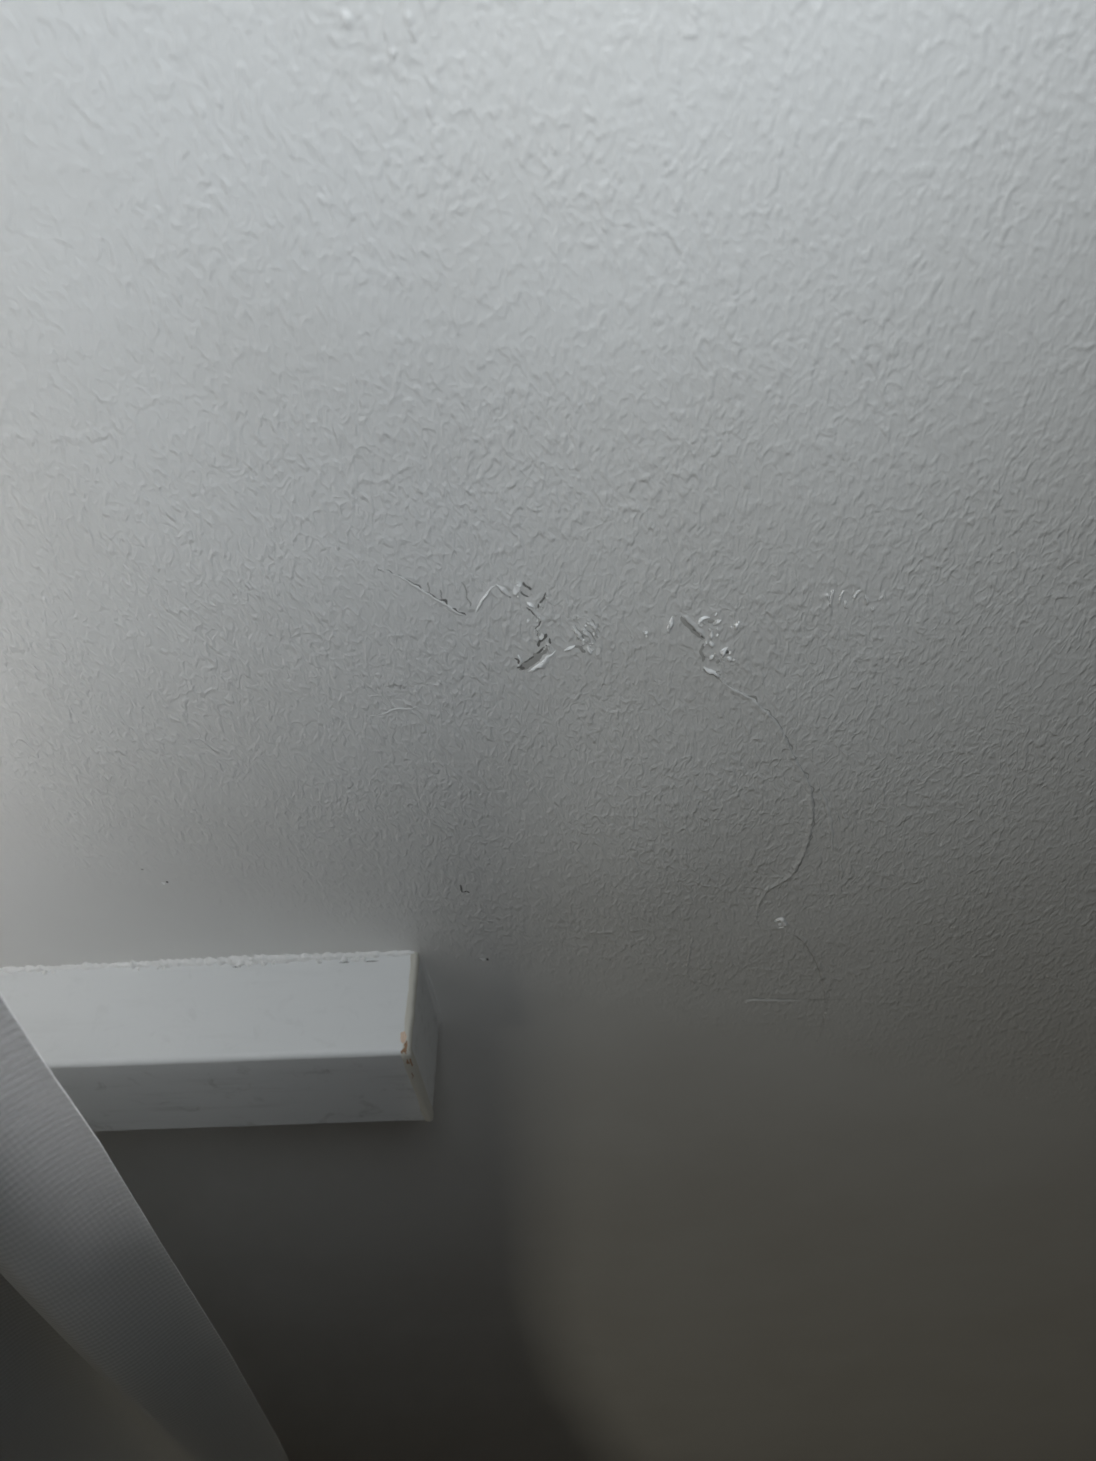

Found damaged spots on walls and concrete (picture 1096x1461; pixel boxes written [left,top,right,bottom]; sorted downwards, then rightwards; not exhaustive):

crack [377,567,471,616]
peeling [475,581,608,672]
peeling [628,613,740,680]